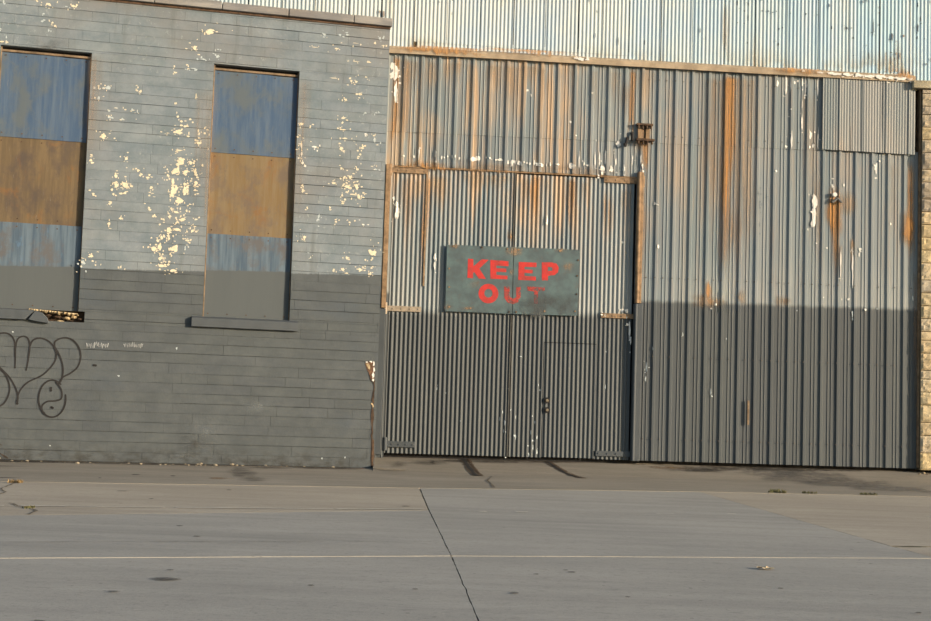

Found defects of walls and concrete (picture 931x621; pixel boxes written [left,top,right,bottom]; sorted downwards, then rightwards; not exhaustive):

peeling [173,29,221,74]
corrosion [405,46,481,54]
peeling [323,116,381,204]
peeling [435,141,644,179]
corrosion [722,78,752,233]
peeling [108,103,208,274]
peeling [807,195,818,230]
corrosion [828,194,852,253]
corrosion [904,169,913,244]
peeling [333,239,383,277]
peeling [838,248,862,300]
spalling [28,308,85,323]